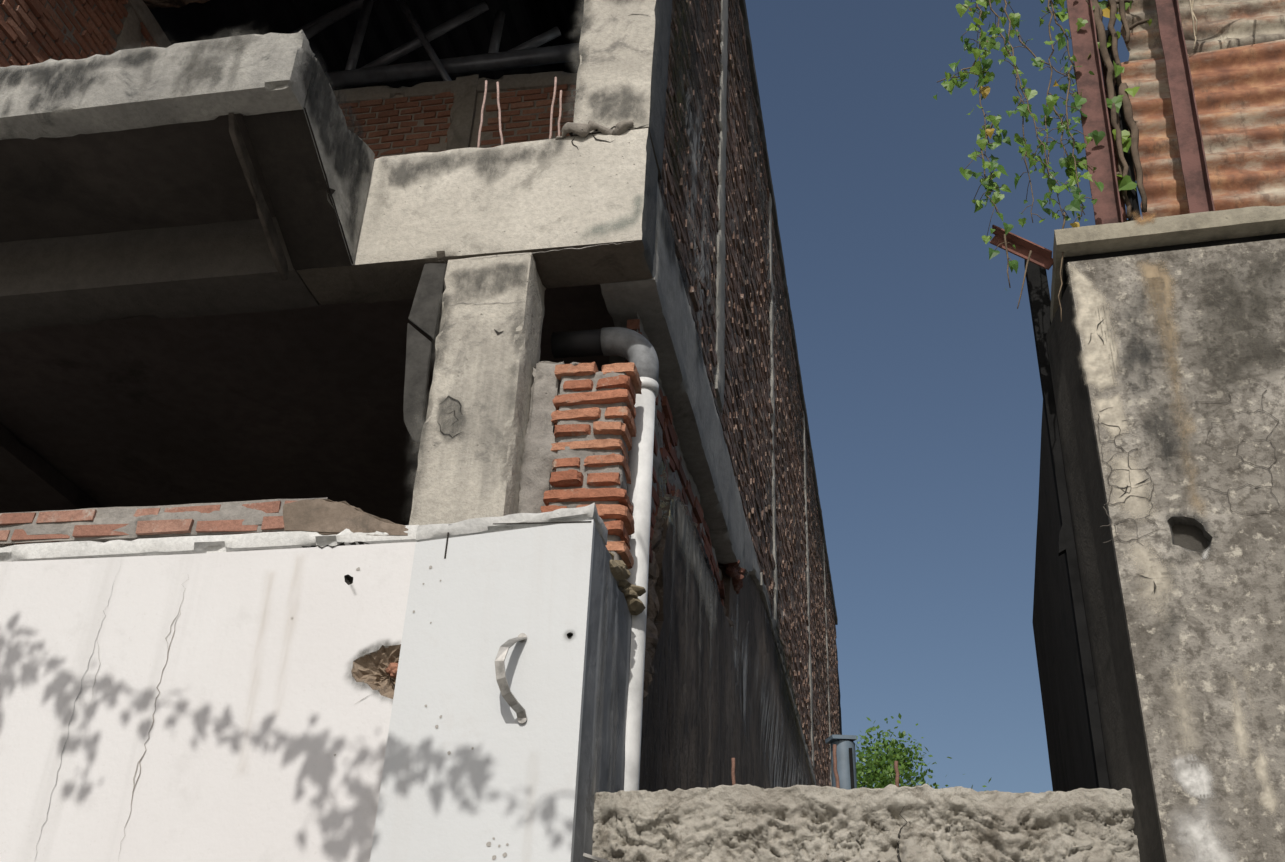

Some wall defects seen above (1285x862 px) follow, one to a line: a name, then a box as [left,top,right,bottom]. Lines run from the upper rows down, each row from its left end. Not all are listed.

spalling [555,120,634,140]
spalling [643,493,746,699]
crack [1097,407,1158,545]
spalling [1167,515,1213,555]
crack [120,577,189,850]
spalling [351,642,401,704]
water stain [735,645,807,788]